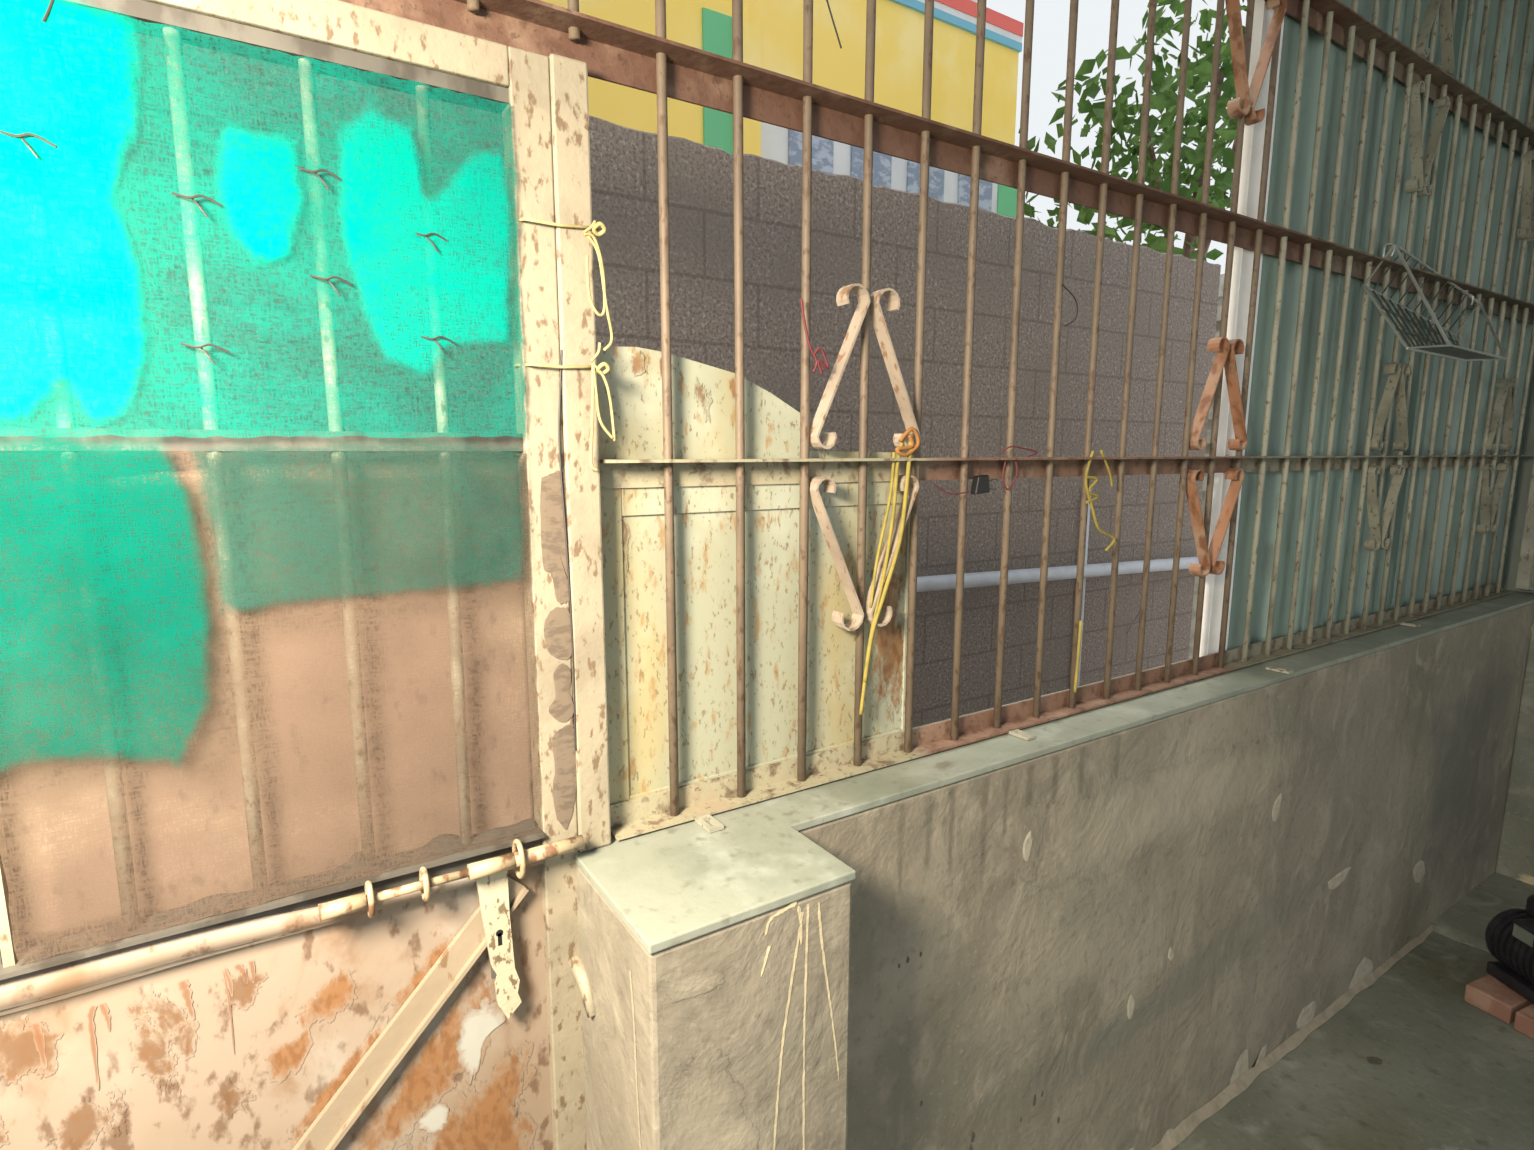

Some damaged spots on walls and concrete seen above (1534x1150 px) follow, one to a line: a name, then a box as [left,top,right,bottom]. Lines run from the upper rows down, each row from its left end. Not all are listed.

peeling [540,470,577,830]
corrosion [868,511,907,722]
corrosion [0,1013,64,1096]
corrosion [40,979,199,1150]
corrosion [209,1077,256,1119]
corrosion [221,960,268,1052]
corrosion [264,969,358,1083]
corrosion [283,929,459,1150]
corrosion [355,958,538,1150]
peeling [456,996,506,1085]